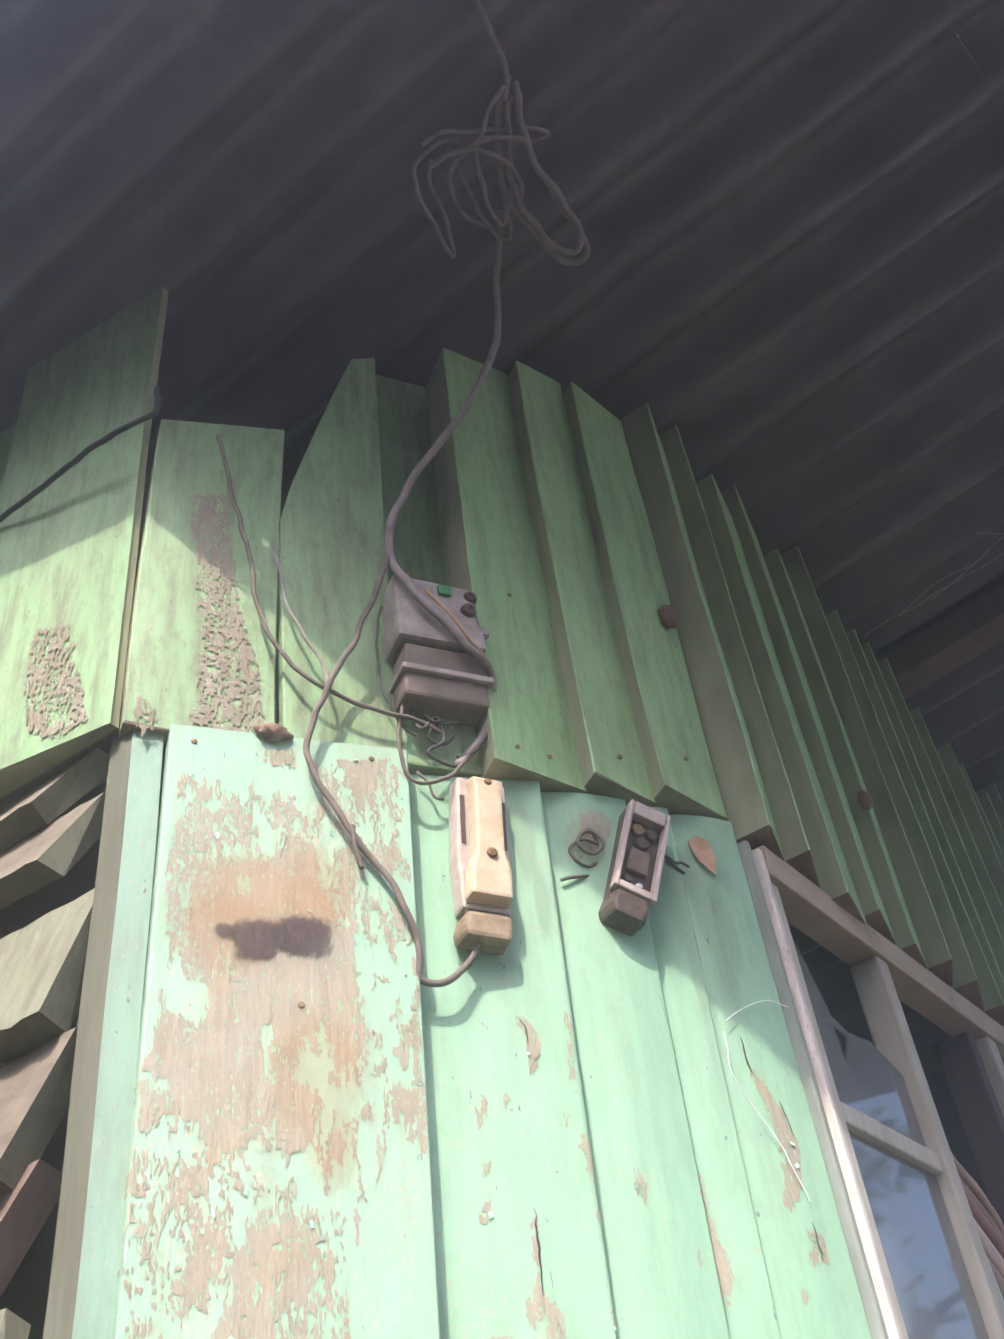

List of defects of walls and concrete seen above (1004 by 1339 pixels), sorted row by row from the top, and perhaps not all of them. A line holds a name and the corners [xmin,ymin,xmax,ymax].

peeling [186,493,266,733]
peeling [22,622,88,741]
peeling [133,696,157,736]
peeling [263,748,295,769]
peeling [117,755,428,1339]
peeling [515,1015,542,1074]
peeling [475,1093,513,1131]
peeling [749,1066,803,1213]
peeling [479,1198,493,1224]
crack [533,1207,553,1291]
peeling [524,1216,566,1339]
peeling [695,1160,735,1306]